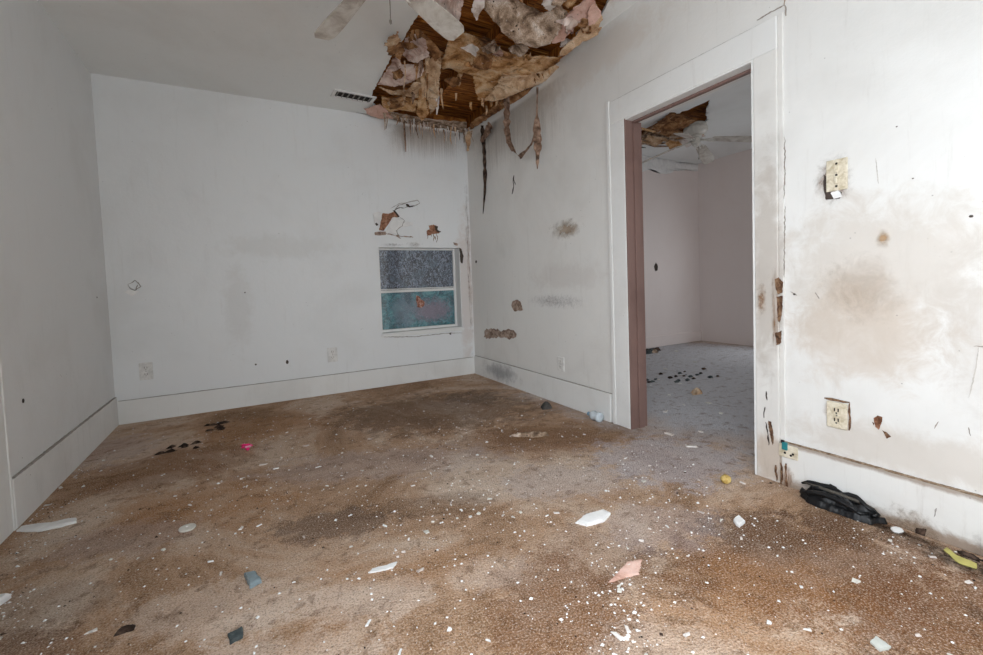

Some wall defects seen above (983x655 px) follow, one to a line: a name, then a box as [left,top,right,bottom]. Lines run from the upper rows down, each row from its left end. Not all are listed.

crack [758,0,787,20]
spalling [373,210,412,239]
spalling [427,225,441,242]
spalling [511,300,523,312]
spalling [484,328,517,340]
spalling [763,391,774,445]
peeling [872,415,891,438]